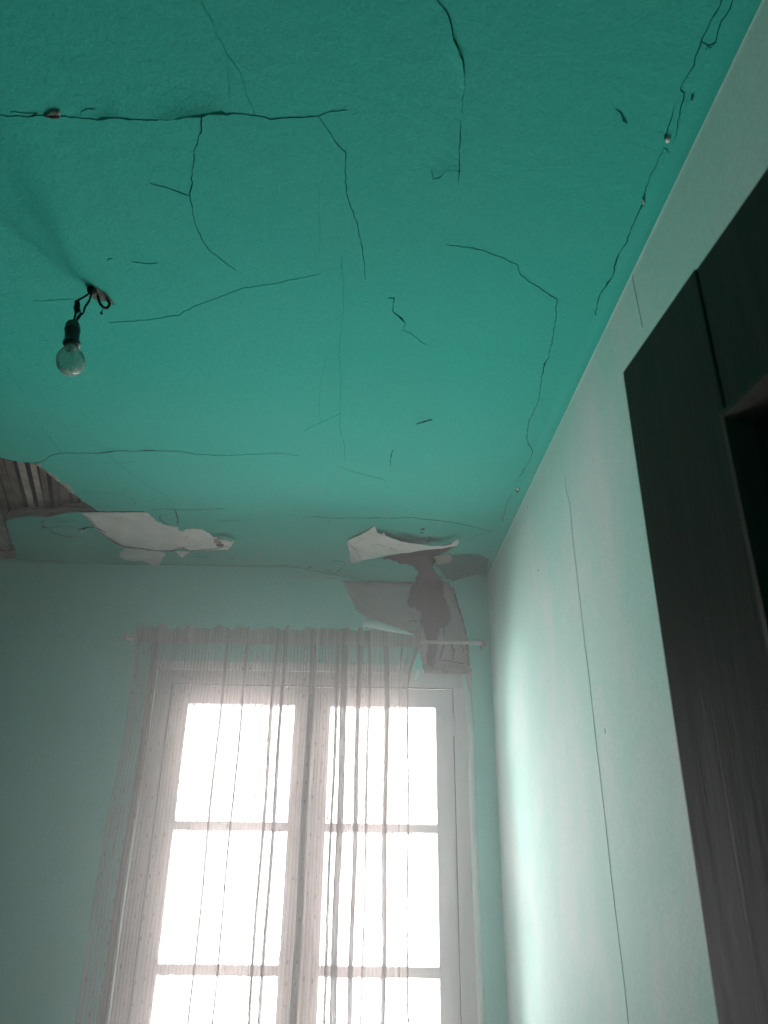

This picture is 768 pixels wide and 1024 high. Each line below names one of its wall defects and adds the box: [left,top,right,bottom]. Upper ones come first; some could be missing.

crack [1,1,393,480]
crack [427,0,465,184]
crack [595,0,733,324]
crack [305,245,557,536]
flaking render [80,511,235,565]
flaking render [347,526,459,566]
water stain [383,543,454,668]